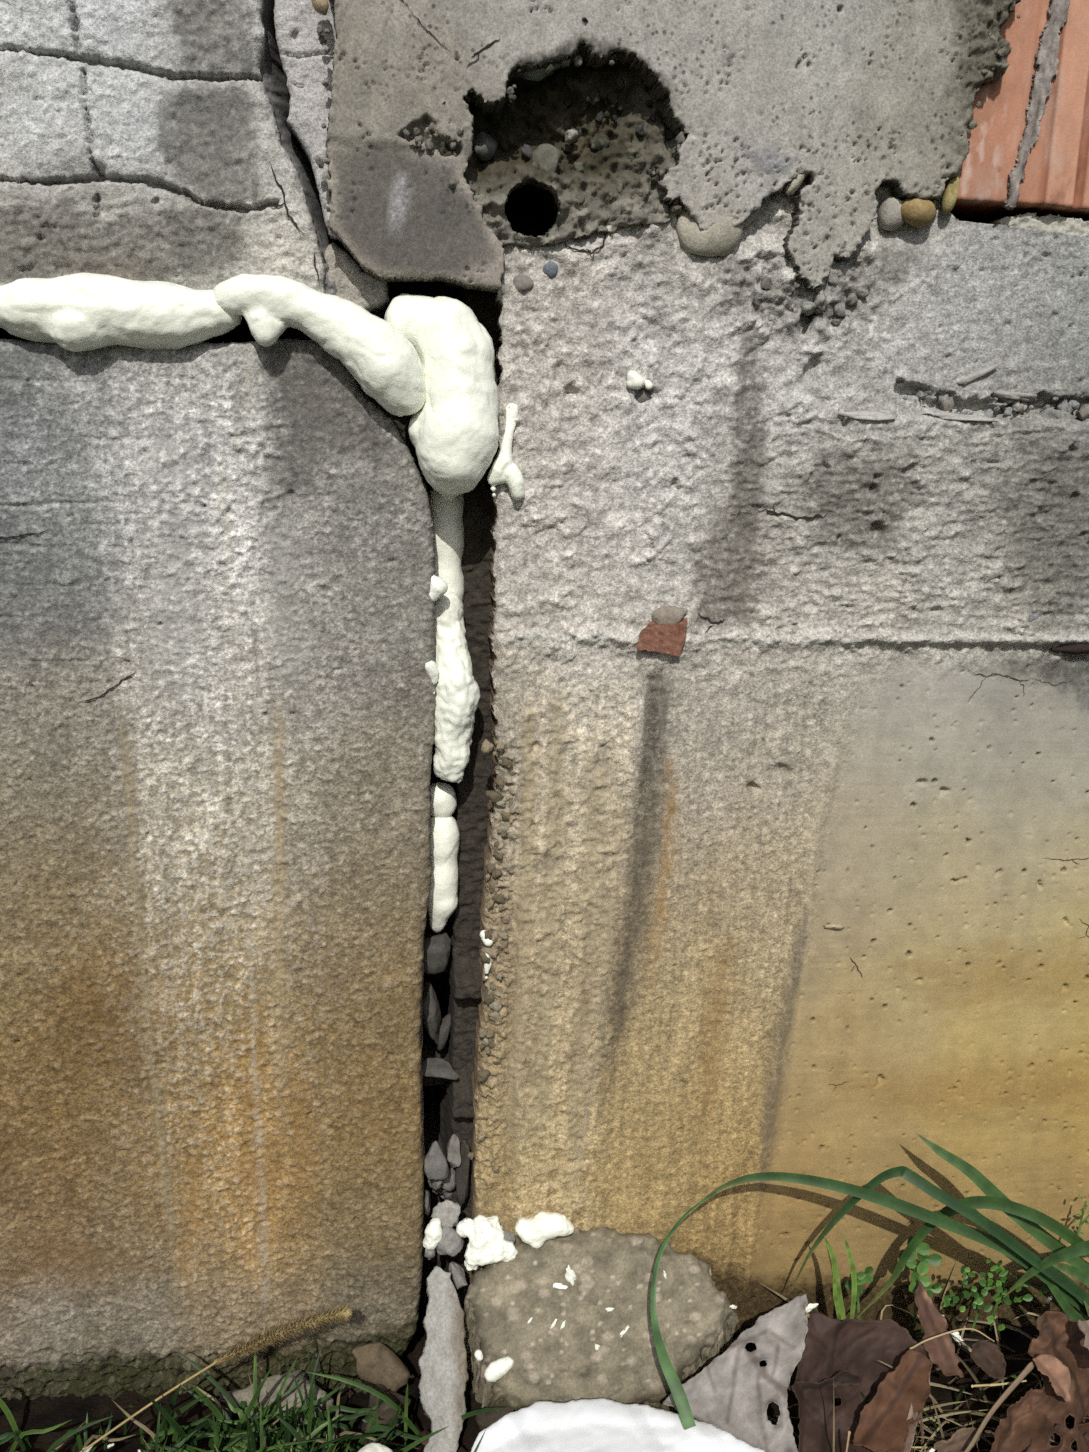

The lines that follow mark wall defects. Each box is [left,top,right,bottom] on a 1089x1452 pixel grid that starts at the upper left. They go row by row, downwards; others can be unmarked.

spalling [402,48,687,251]
leakage [573,684,666,1159]